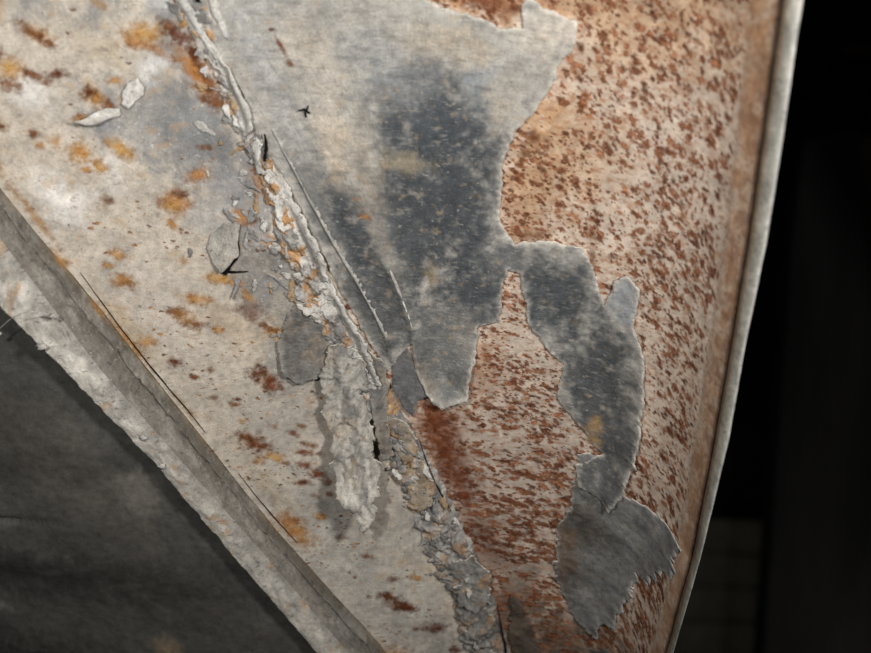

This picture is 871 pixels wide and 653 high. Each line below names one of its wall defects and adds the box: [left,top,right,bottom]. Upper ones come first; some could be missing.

corrosion [26,27,54,47]
corrosion [0,52,65,90]
peeling [74,108,121,126]
corrosion [85,88,114,108]
crack [261,134,269,162]
crack [222,230,248,276]
crack [81,274,205,432]
peeling [166,0,681,653]
corrosion [230,367,282,422]
corrosion [221,424,332,496]
crack [418,437,451,511]
crack [239,474,296,541]